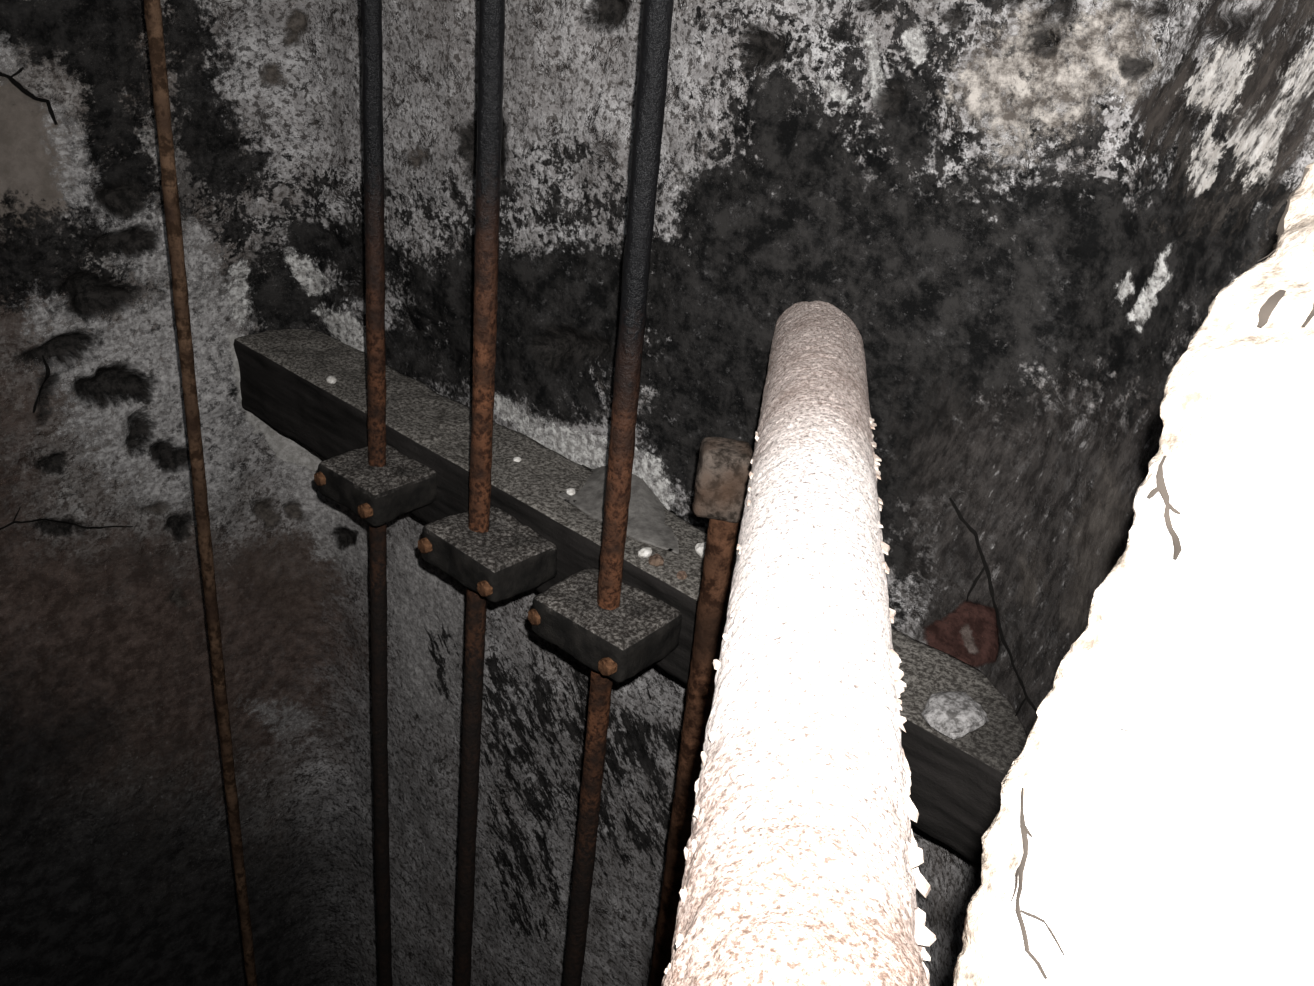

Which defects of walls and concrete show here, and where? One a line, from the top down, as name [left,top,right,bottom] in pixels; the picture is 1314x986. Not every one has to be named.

leakage [0,39,17,74]
crack [0,67,58,125]
leakage [24,99,253,516]
crack [1147,456,1182,560]
crack [1011,787,1065,979]